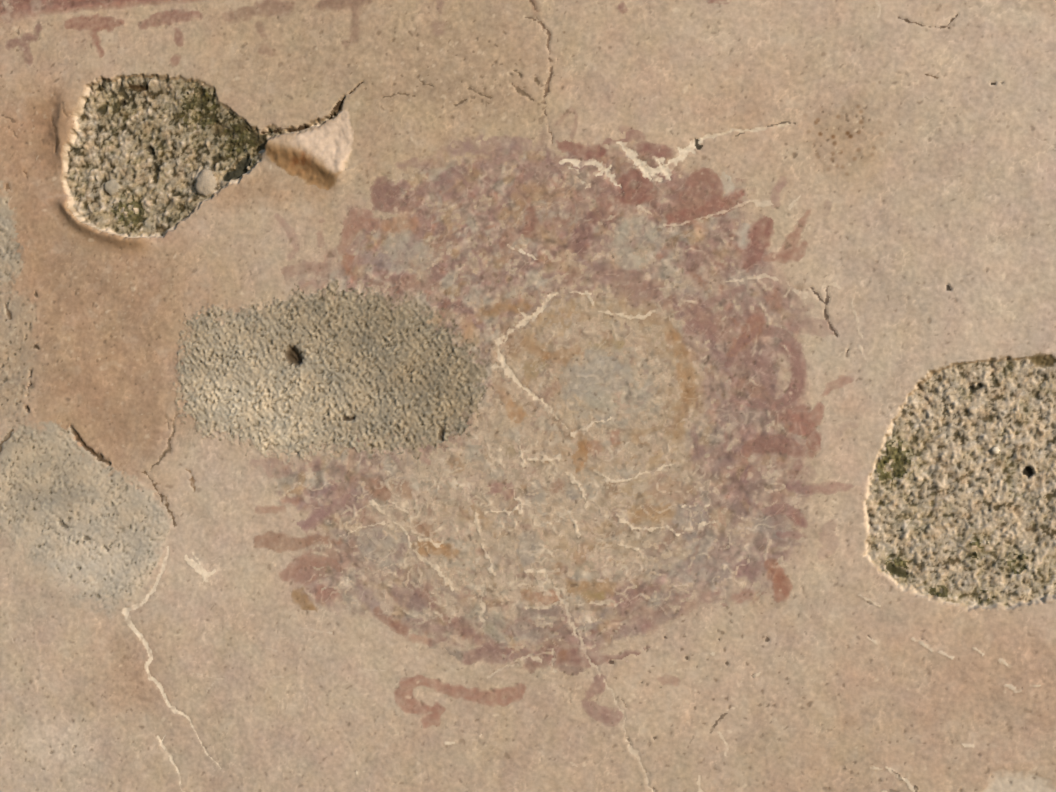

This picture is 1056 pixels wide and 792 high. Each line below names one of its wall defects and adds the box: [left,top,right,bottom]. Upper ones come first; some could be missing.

flaking render [61,73,355,239]
damp [210,160,340,216]
crack [525,0,801,231]
spalling [284,344,302,367]
crack [725,273,868,362]
flaking render [861,352,1056,612]
crack [121,412,222,792]
flaking render [976,768,1056,792]